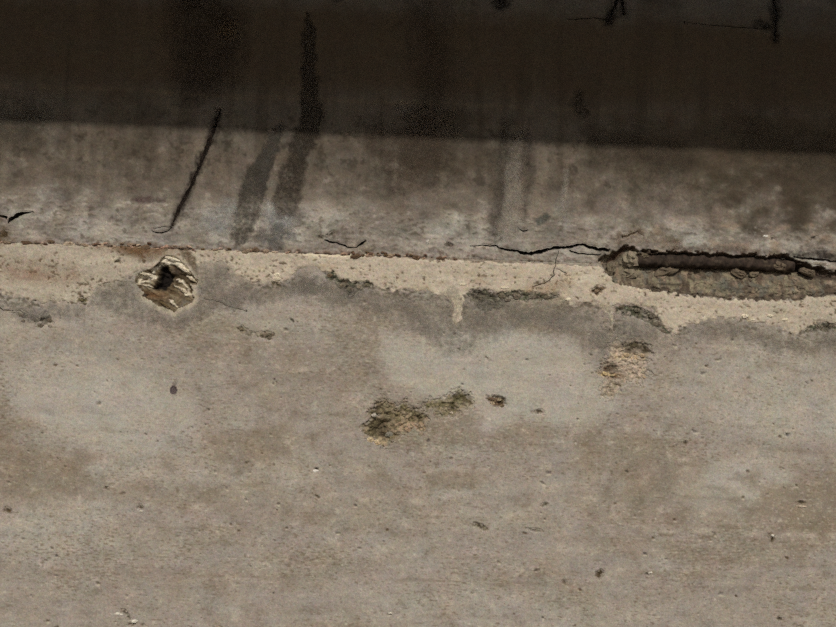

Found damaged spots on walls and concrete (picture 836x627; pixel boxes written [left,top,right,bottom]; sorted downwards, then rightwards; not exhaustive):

crack [567,0,626,24]
crack [684,0,780,42]
damp [202,13,323,246]
crack [152,110,222,235]
crack [0,211,33,224]
flaking render [0,229,836,336]
crack [471,228,644,288]
crack [789,250,836,264]
spalling [591,333,654,402]
spalling [359,386,475,451]
spalling [485,394,507,408]